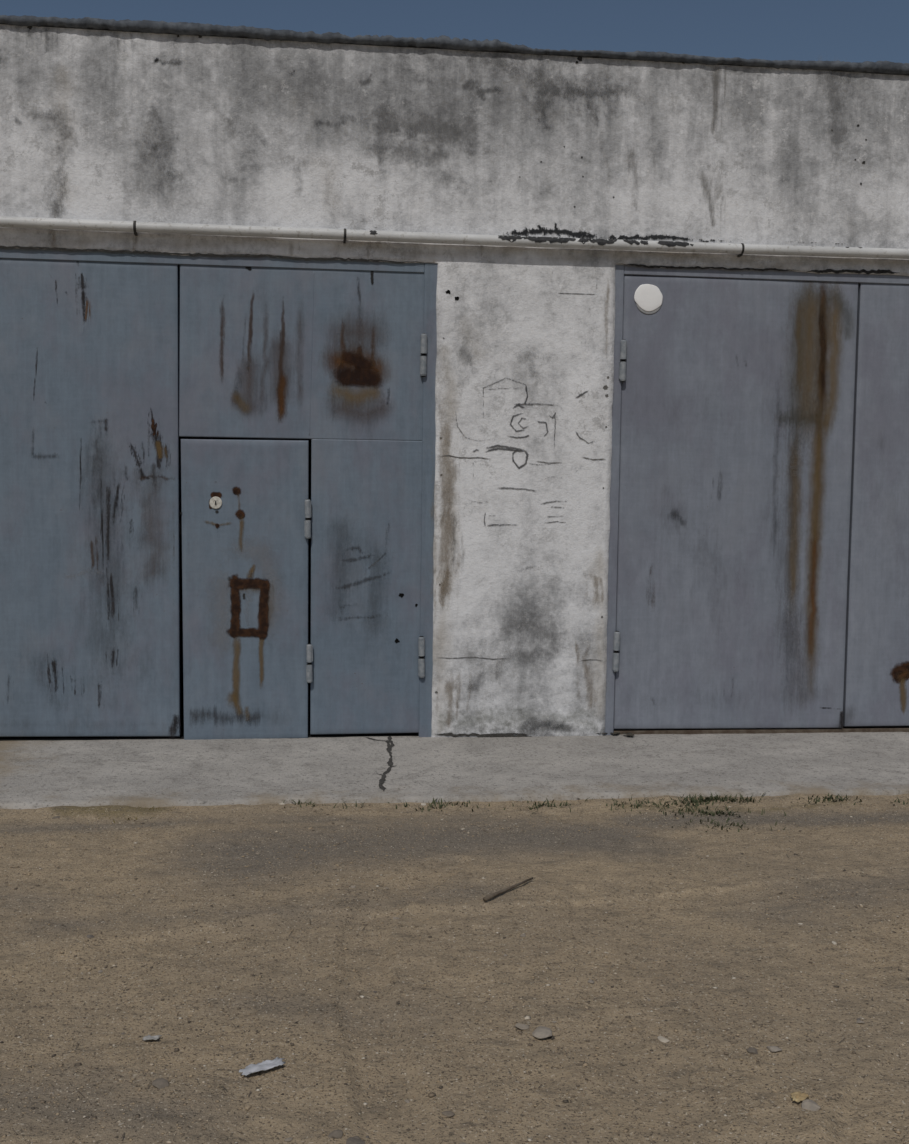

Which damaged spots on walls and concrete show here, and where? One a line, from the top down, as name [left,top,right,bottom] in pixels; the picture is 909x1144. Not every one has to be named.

rust [235,295,254,410]
rust [277,311,286,416]
rust [329,325,389,416]
rust [789,292,839,657]
rust [228,565,270,716]
rust [890,662,909,712]
crack [366,736,397,791]